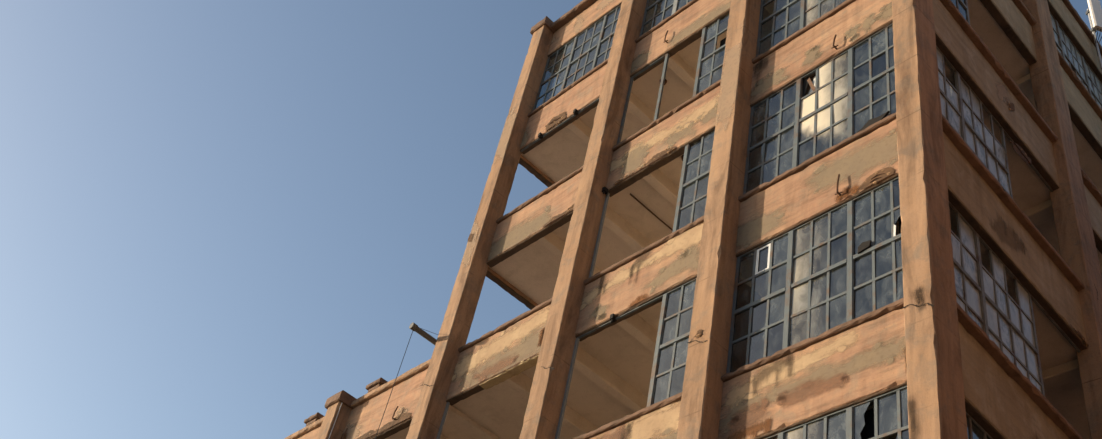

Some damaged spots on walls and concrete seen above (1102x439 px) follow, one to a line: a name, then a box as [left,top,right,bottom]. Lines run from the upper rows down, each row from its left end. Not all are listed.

peeling [580,223,704,320]
peeling [452,309,549,391]
peeling [597,402,681,439]